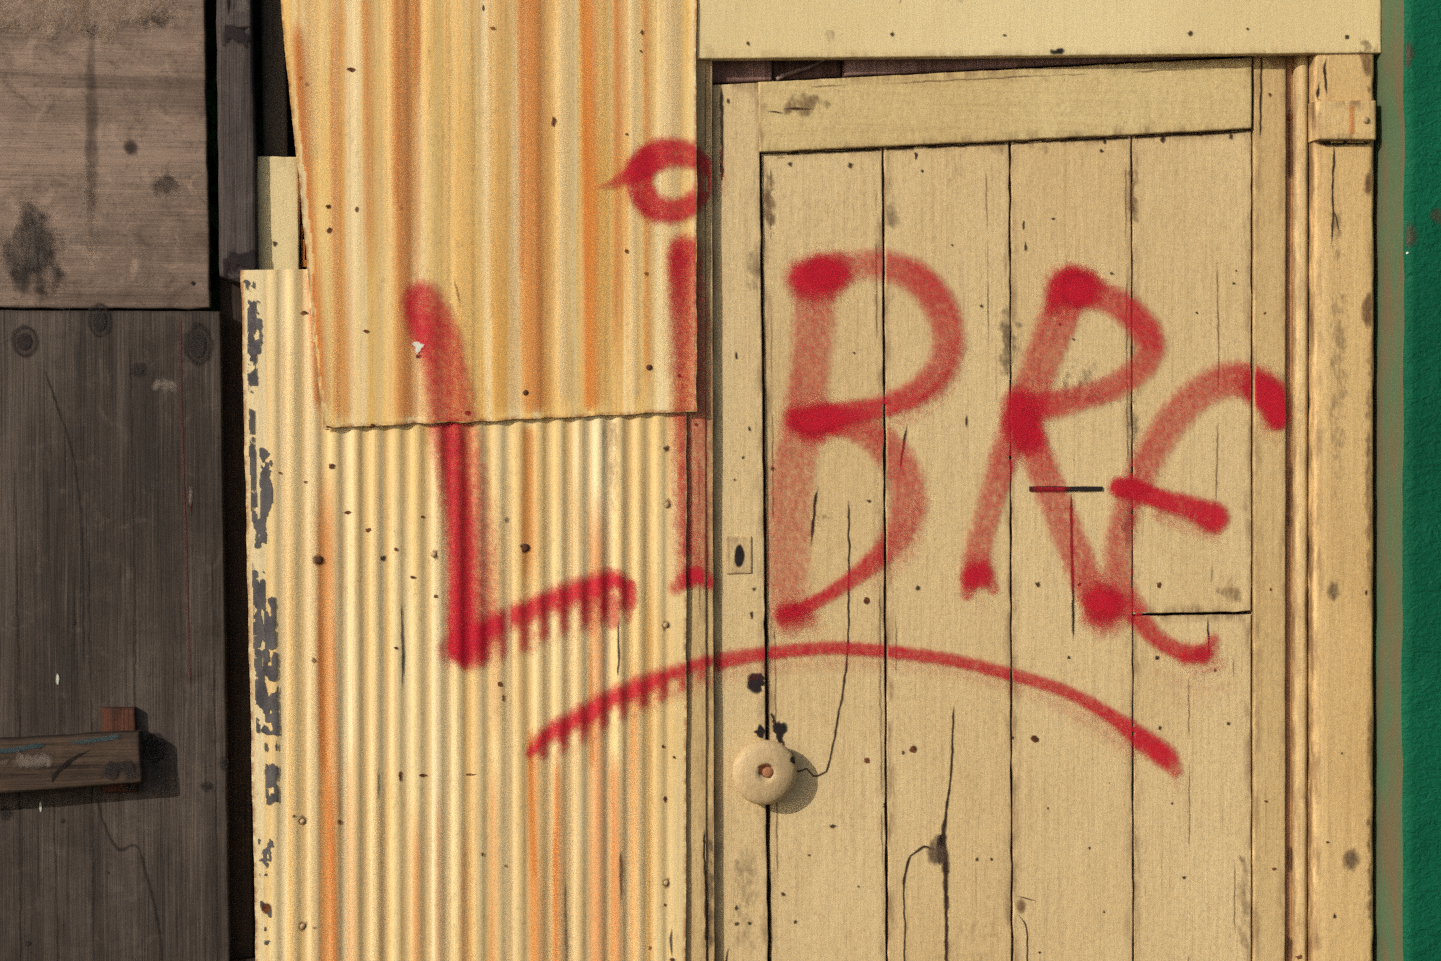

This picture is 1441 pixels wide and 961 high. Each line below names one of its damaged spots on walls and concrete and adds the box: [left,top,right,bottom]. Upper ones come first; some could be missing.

damp [5,209,60,294]
rust [295,36,332,400]
rust [396,0,421,416]
rust [583,0,595,407]
peeling [243,280,280,805]
peeling [258,839,273,876]
rust [311,536,342,869]
crack [770,492,896,777]
crack [881,709,954,961]